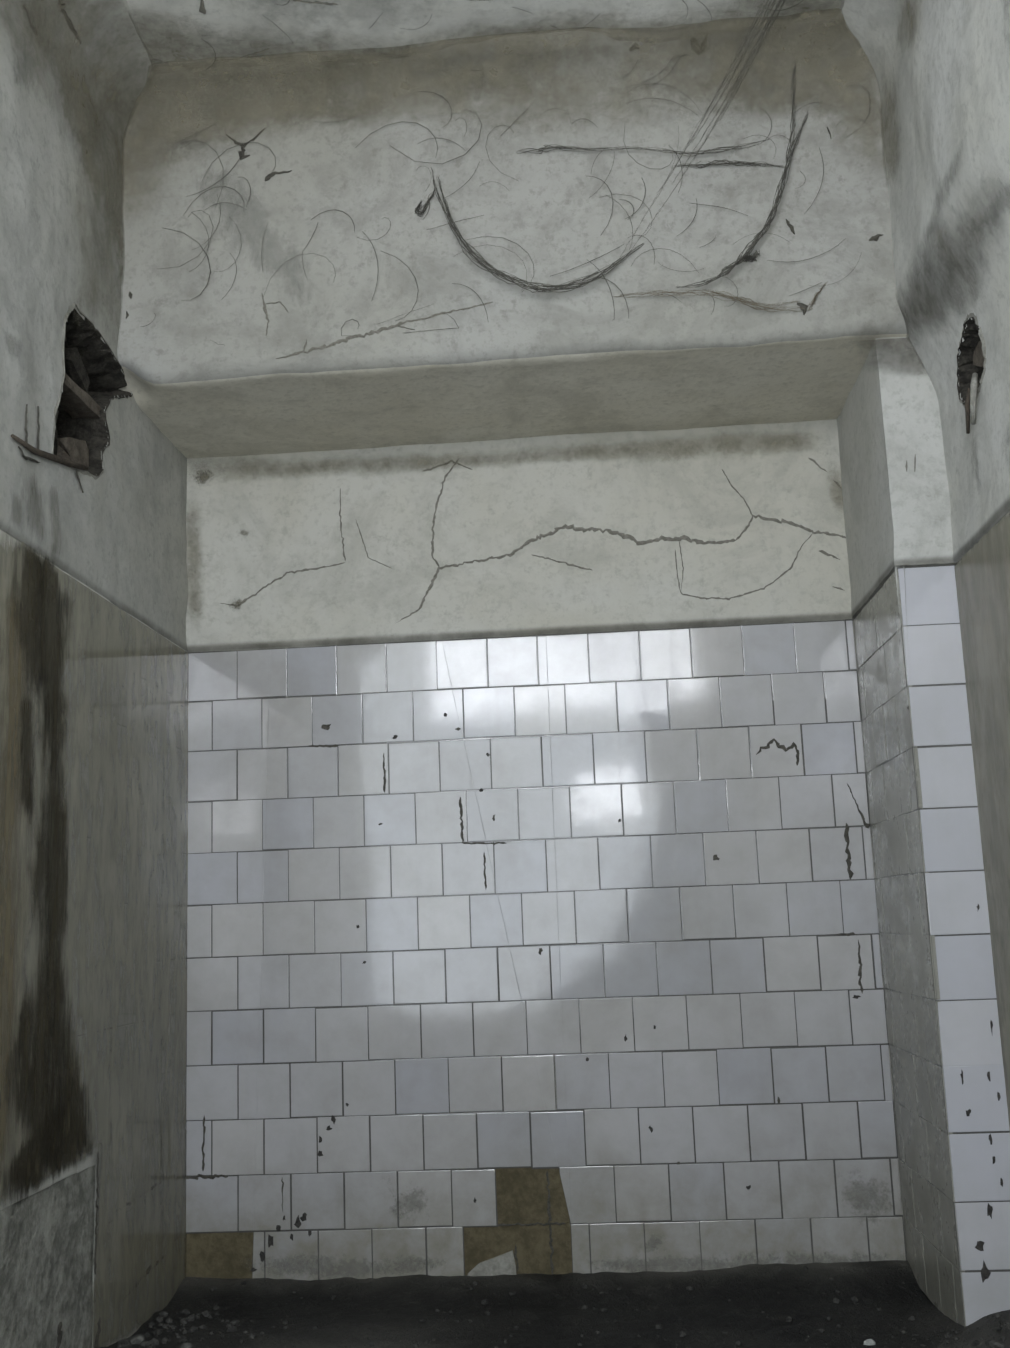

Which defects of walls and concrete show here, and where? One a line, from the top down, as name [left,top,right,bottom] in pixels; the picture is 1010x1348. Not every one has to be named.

crack [23,0,81,43]
spalling [11,303,133,493]
spalling [957,313,986,434]
crack [221,489,390,608]
crack [400,459,846,621]
water stain [955,516,1010,1128]
water stain [0,480,189,1348]
peeling [0,1152,101,1348]
peeling [186,1232,253,1279]
peeling [464,1168,573,1276]